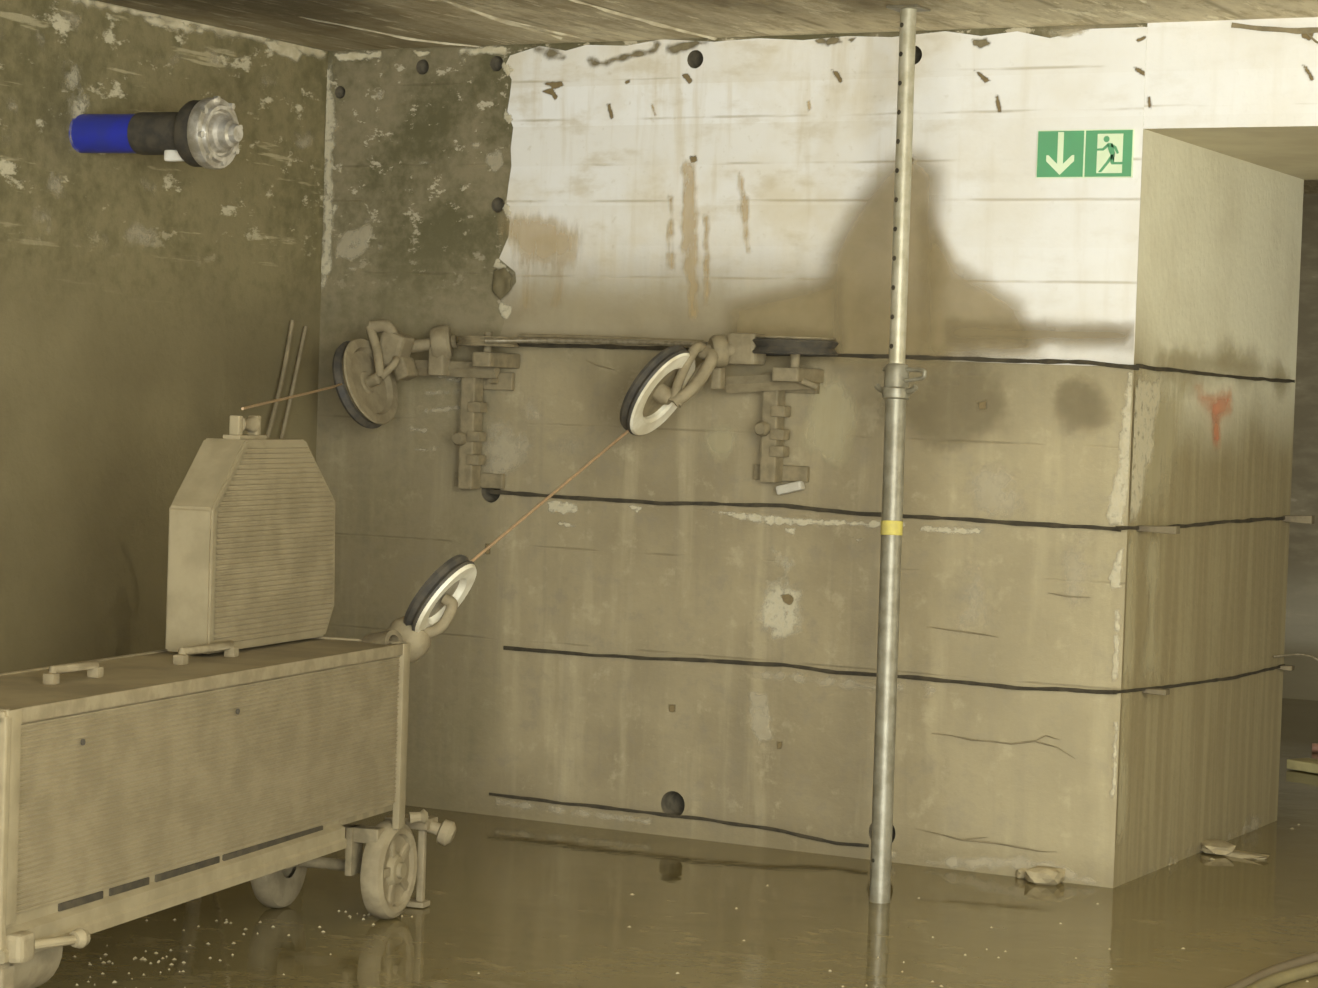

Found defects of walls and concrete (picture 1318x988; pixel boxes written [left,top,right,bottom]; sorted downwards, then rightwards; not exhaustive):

spalling [68,67,87,118]
peeling [499,302,511,319]
spalling [1106,372,1160,525]
spalling [1109,549,1123,588]
spalling [1112,611,1120,680]
crack [940,734,1075,759]
spalling [1110,722,1118,796]
crack [917,829,1047,852]